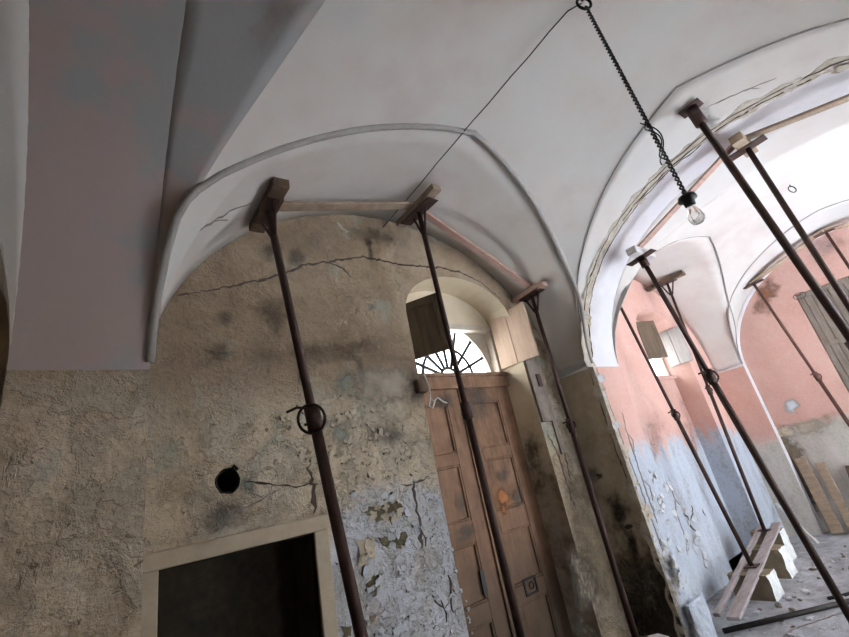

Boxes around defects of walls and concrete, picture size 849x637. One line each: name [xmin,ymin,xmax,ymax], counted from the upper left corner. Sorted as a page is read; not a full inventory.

crack [177,255,501,299]
spalling [580,56,849,637]
peeling [295,442,322,485]
crack [223,464,317,518]
peeling [322,394,473,637]